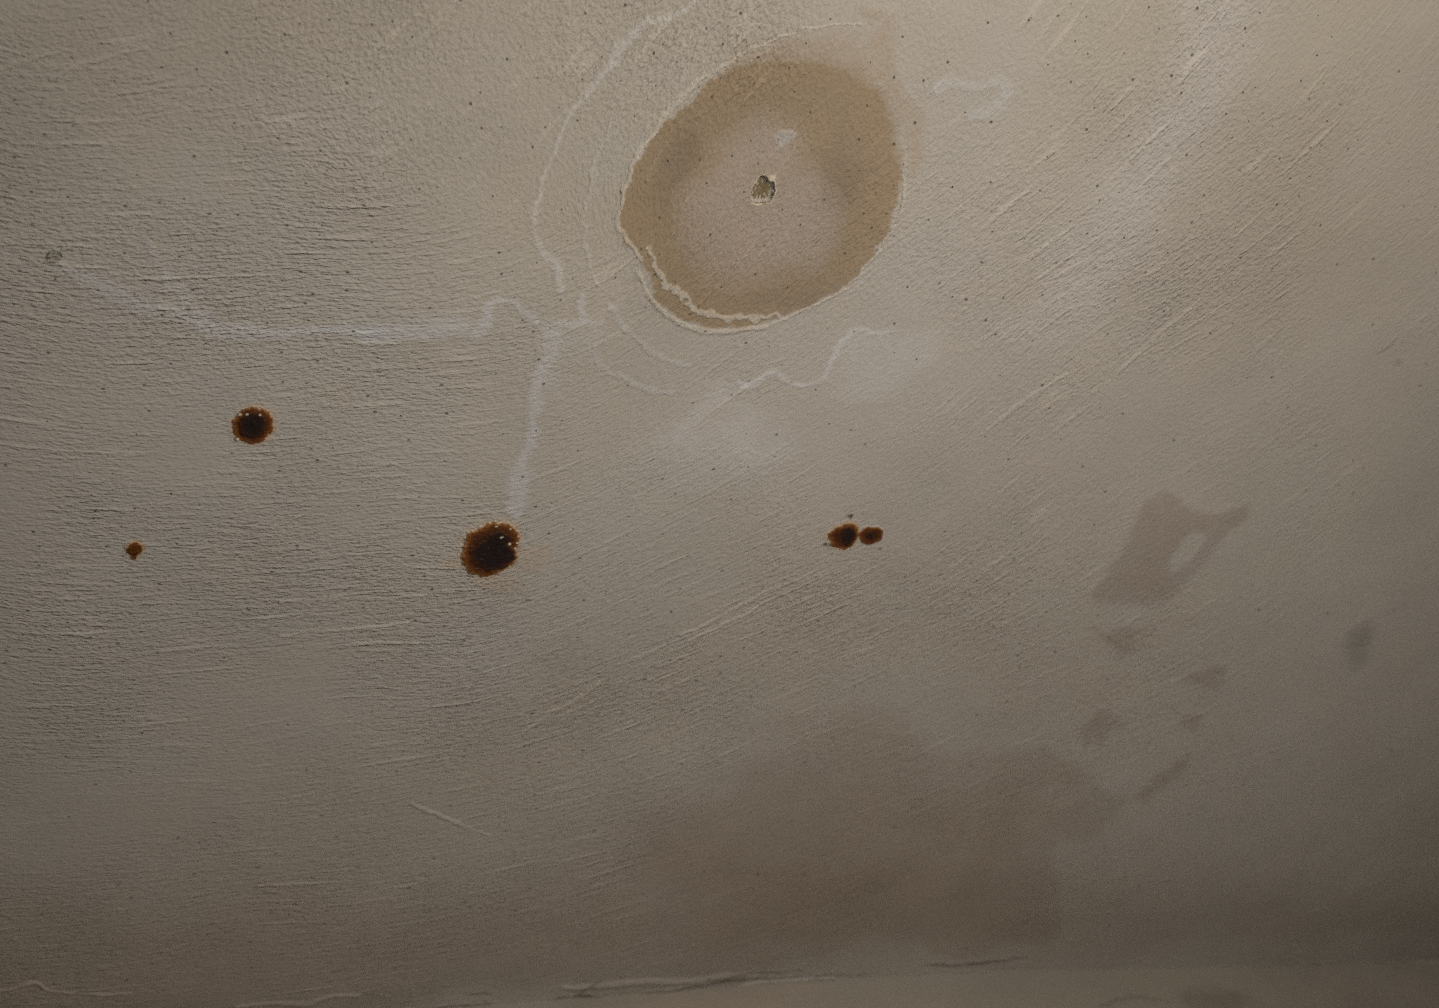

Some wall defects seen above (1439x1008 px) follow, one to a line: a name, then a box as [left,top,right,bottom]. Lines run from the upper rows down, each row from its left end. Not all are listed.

leakage [613,1,1018,336]
leakage [53,0,954,521]
rust [225,399,281,449]
rust [122,538,149,563]
rust [430,514,559,599]
rust [821,513,884,554]